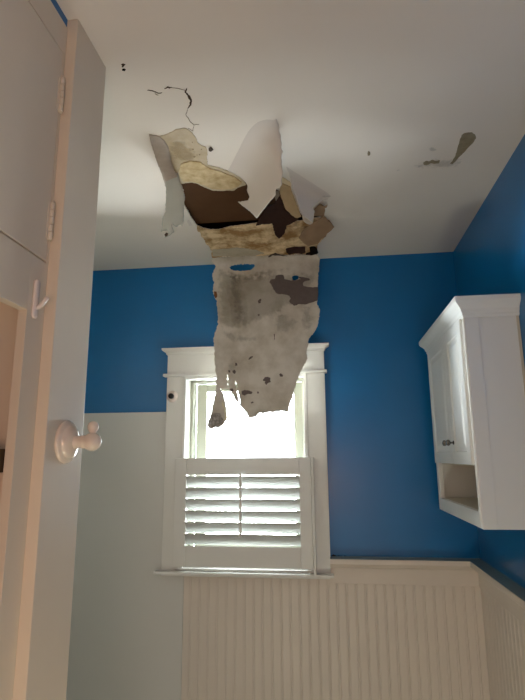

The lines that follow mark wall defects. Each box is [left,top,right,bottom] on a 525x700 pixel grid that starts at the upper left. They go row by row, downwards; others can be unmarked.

crack [147,86,199,131]
peeling [450,132,476,164]
peeling [160,119,331,229]
peeling [270,275,318,306]